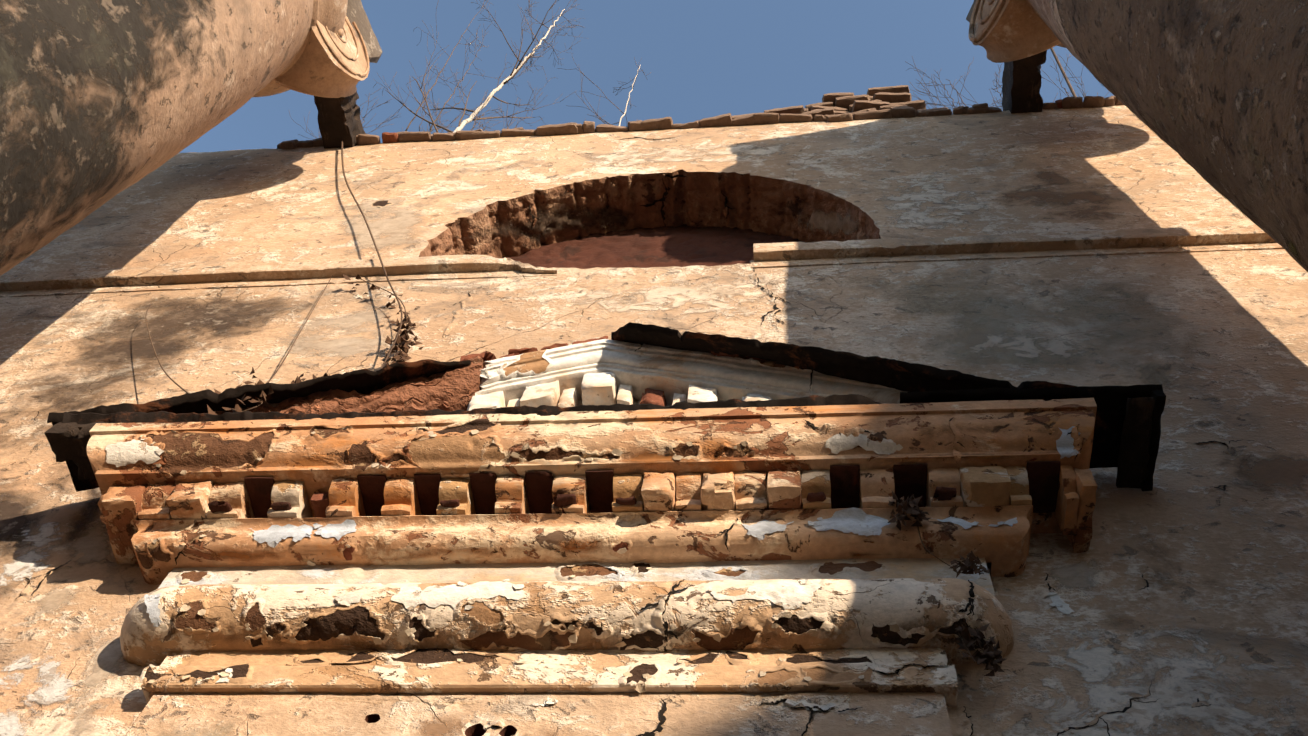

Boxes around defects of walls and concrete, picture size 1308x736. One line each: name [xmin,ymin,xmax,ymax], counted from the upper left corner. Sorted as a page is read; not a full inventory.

crack [749,267,789,332]
peeling [460,336,619,380]
peeling [105,429,281,479]
peeling [308,419,623,478]
peeling [667,440,703,461]
crack [16,552,84,600]
peeling [250,519,358,562]
peeling [555,539,653,581]
peeling [742,507,890,540]
peeling [140,559,977,711]
crack [636,698,667,736]
crack [1055,677,1211,736]